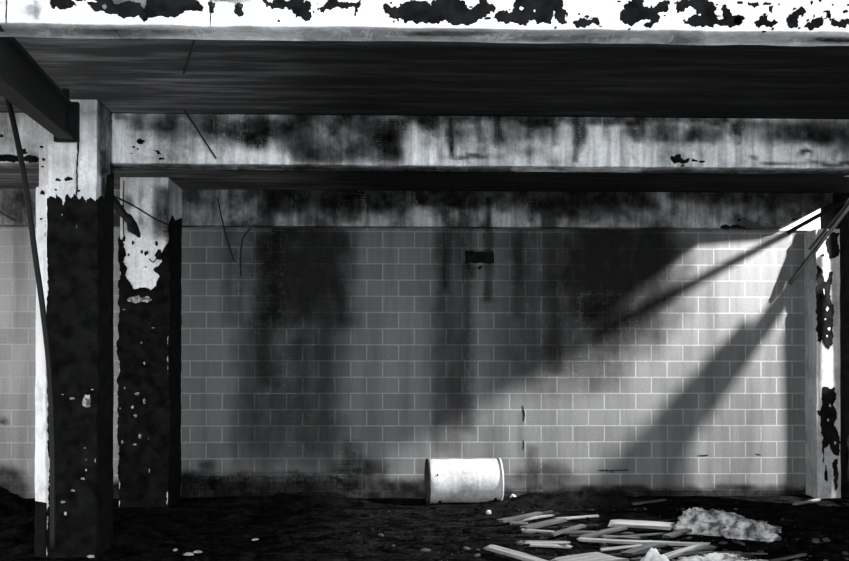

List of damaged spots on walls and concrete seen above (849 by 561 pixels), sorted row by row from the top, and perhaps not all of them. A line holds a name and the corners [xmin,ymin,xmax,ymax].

peeling [50,0,223,22]
peeling [263,0,361,21]
peeling [383,0,602,29]
peeling [617,0,849,33]
water stain [244,113,269,149]
water stain [423,117,485,158]
peeling [0,146,45,167]
peeling [122,236,163,260]
peeling [821,232,840,259]
peeling [122,296,152,310]
peeling [815,265,834,349]
peeling [817,386,841,490]